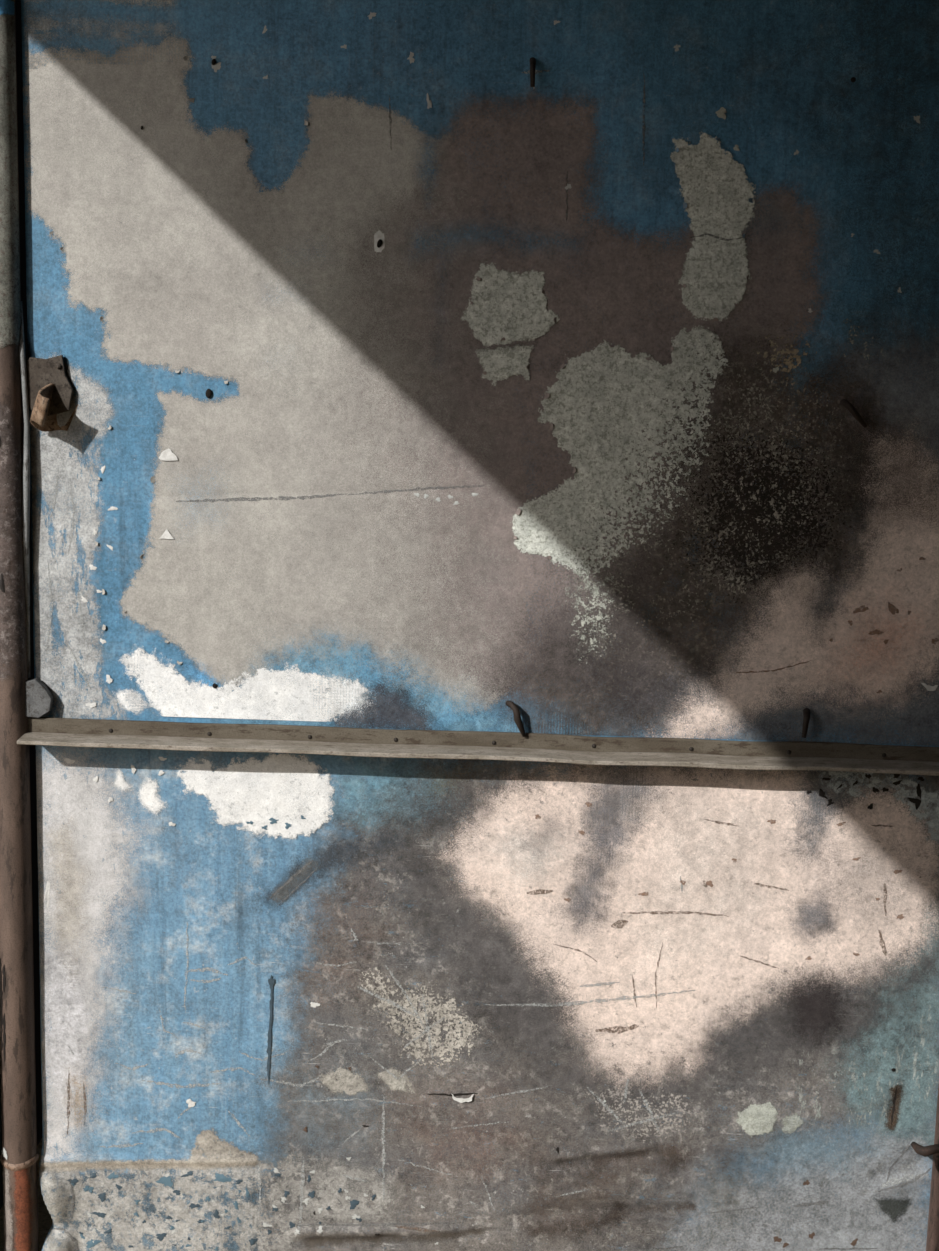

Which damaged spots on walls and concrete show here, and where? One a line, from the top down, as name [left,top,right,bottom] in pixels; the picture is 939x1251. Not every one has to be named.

peeling [374,230,385,252]
peeling [461,261,559,387]
peeling [510,132,848,664]
peeling [159,448,178,461]
corrosion [2,1148,37,1251]